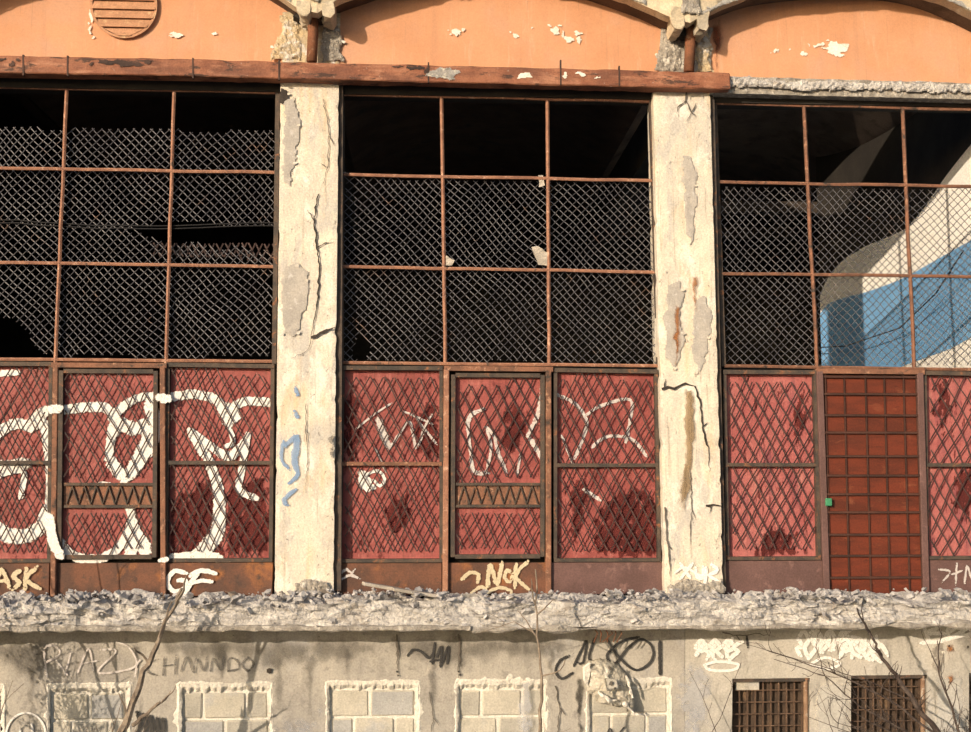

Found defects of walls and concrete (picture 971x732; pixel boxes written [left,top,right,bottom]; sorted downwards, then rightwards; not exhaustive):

spalling [279,88,290,104]
peeling [548,24,583,44]
peeling [773,39,849,57]
spalling [730,76,971,93]
crack [293,99,335,358]
peeling [681,156,698,244]
peeling [663,280,712,374]
water stain [681,391,695,509]
crack [662,380,720,581]